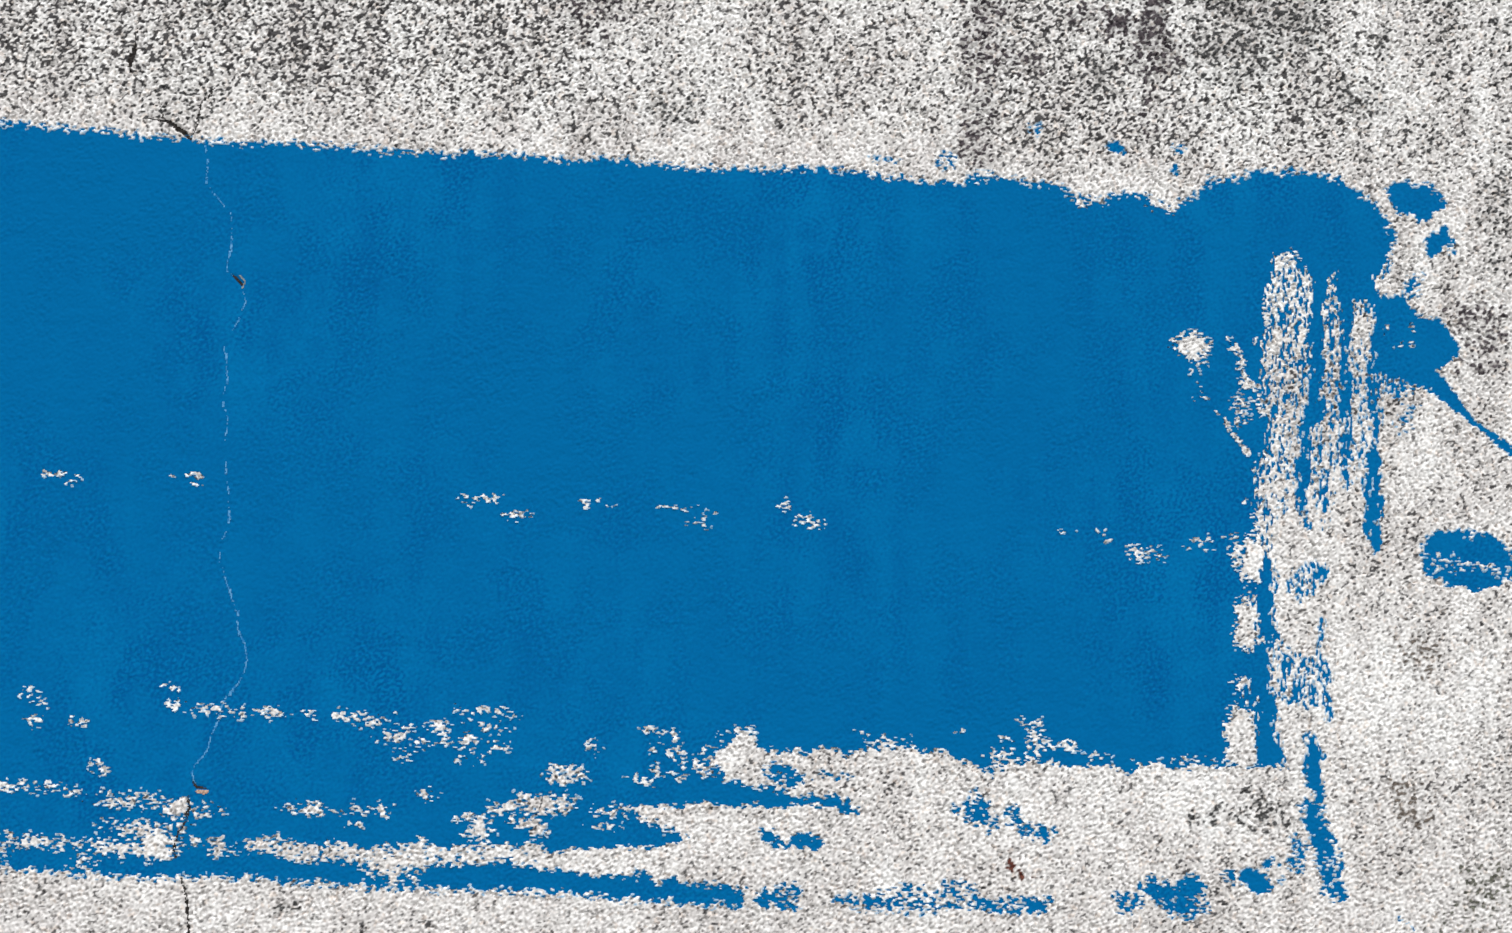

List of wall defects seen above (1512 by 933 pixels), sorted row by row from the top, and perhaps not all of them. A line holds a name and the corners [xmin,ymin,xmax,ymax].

crack [124,28,138,73]
peeling [1096,249,1416,654]
peeling [41,469,82,486]
peeling [169,472,204,487]
crack [143,88,248,933]
peeling [456,493,533,523]
peeling [655,505,719,530]
peeling [775,496,828,530]
peeling [0,674,1291,919]